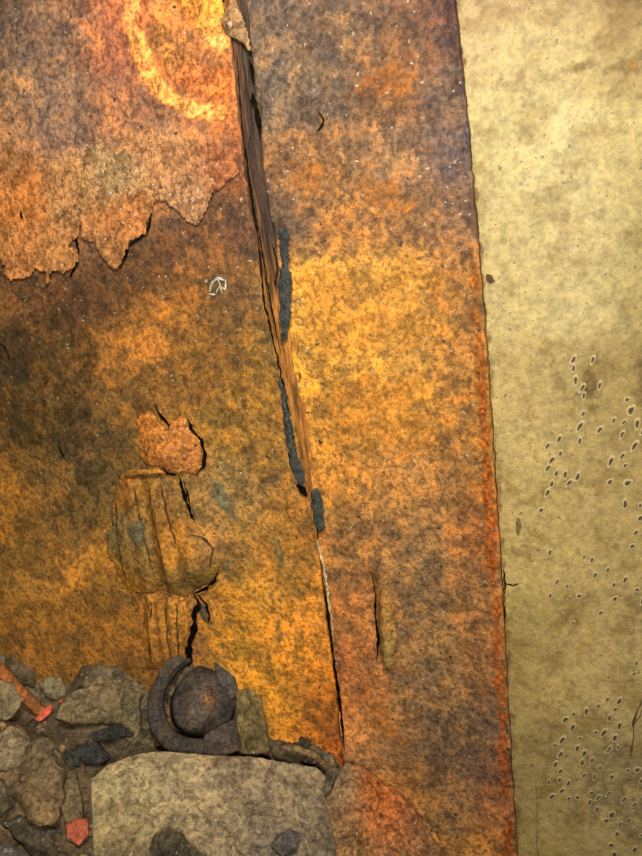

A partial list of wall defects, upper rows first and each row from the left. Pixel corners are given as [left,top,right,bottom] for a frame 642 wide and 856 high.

corrosion [122,0,232,121]
peeling [0,141,239,284]
crack [237,55,297,458]
corrosion [294,263,445,348]
water stain [584,372,597,410]
corrosion [470,306,519,856]
crack [323,581,344,748]
corrosion [325,763,449,856]